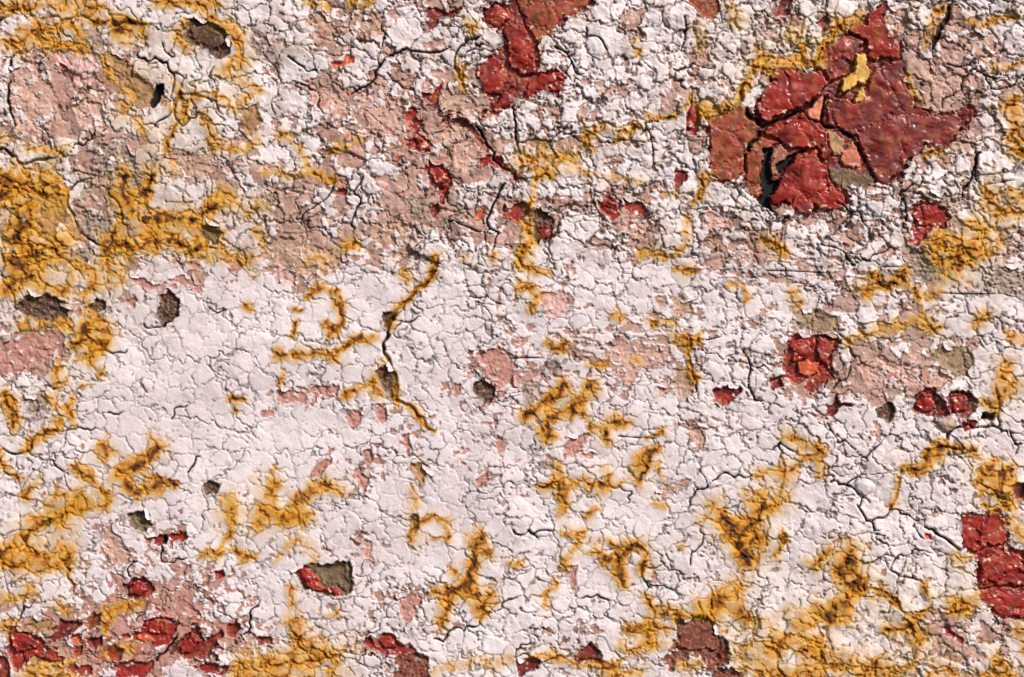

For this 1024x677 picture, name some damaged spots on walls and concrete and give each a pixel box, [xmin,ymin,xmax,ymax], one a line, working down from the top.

crack [0,8,144,165]
crack [351,25,483,94]
peeling [305,0,596,258]
crack [449,106,568,251]
peeling [686,0,977,217]
corrosion [0,167,257,378]
corrosion [273,252,438,385]
corrosion [0,433,180,602]
peeling [0,576,240,677]
corrosion [536,427,665,608]
crack [688,423,963,589]
peeling [955,508,1024,622]